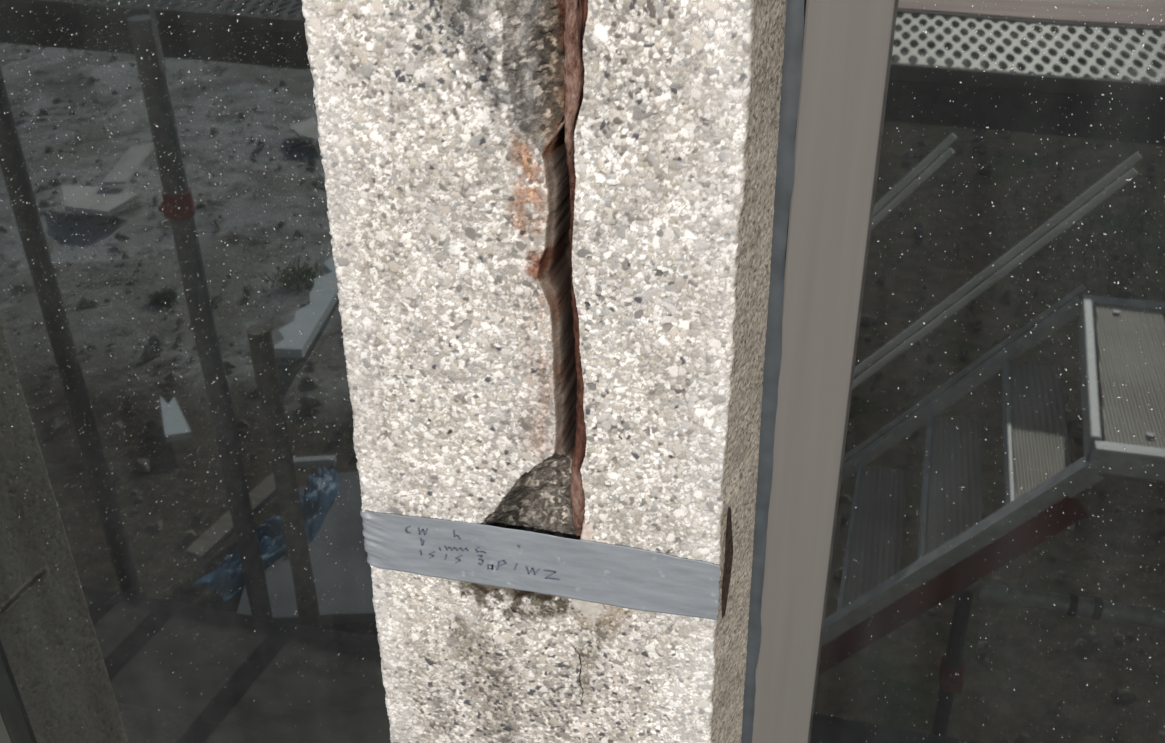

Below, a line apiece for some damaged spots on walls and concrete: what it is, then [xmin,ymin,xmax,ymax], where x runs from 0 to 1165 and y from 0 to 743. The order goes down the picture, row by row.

spalling [495,0,565,153]
corrosion [556,0,565,43]
corrosion [579,0,588,73]
corrosion [527,253,546,282]
crack [539,1,589,539]
spalling [480,453,594,541]